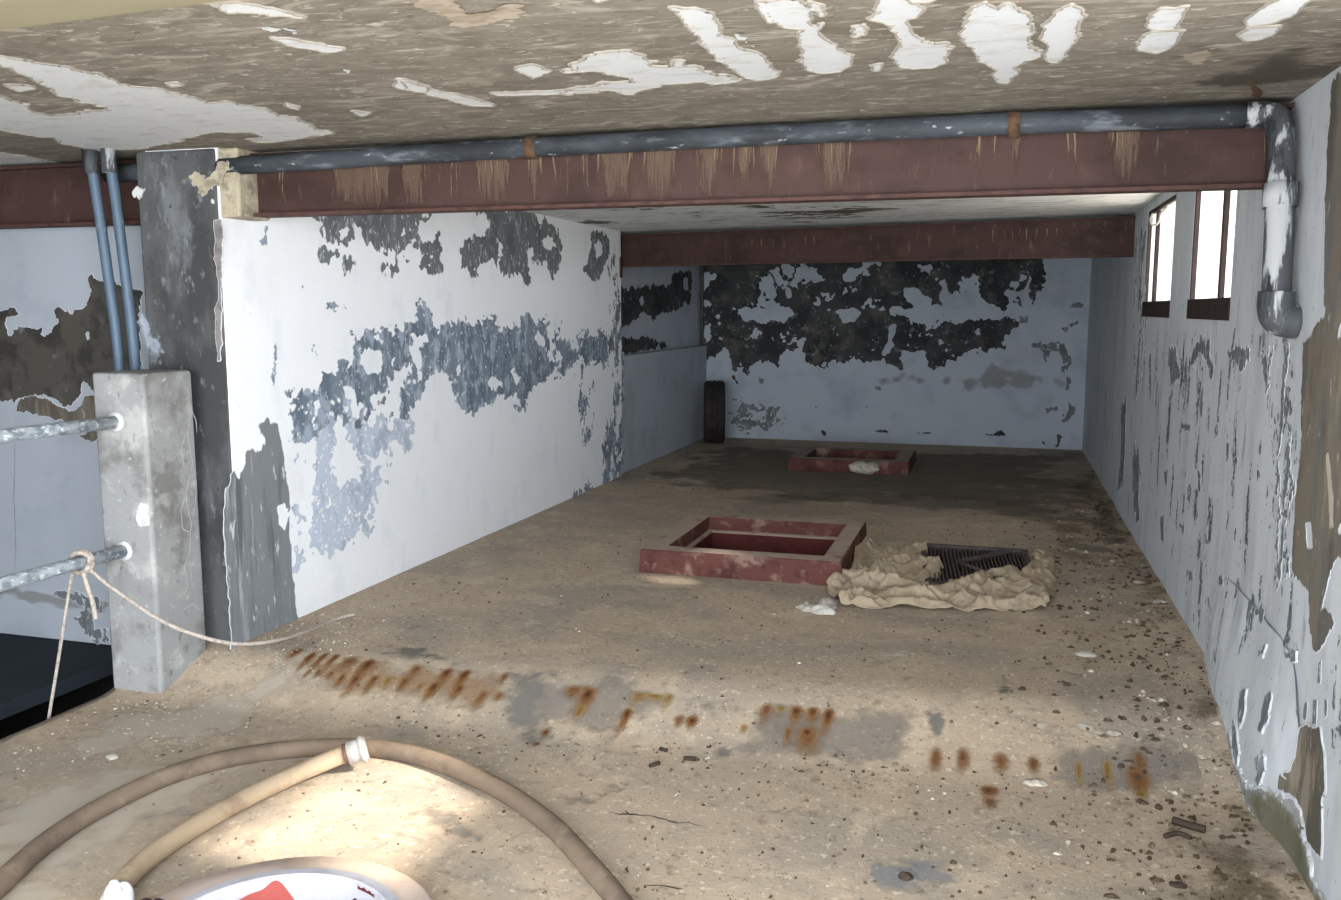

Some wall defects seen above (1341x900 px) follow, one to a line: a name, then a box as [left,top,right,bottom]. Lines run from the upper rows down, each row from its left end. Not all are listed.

peeling [849,23,870,38]
peeling [1144,4,1191,31]
peeling [1235,24,1283,42]
corrosion [332,164,426,206]
corrosion [476,150,677,203]
peeling [0,274,164,443]
peeling [223,207,1047,650]
peeling [1117,70,1341,900]
corrosion [287,649,508,707]
corrosion [565,687,596,717]
corrosion [618,693,698,730]
corrosion [761,704,834,754]